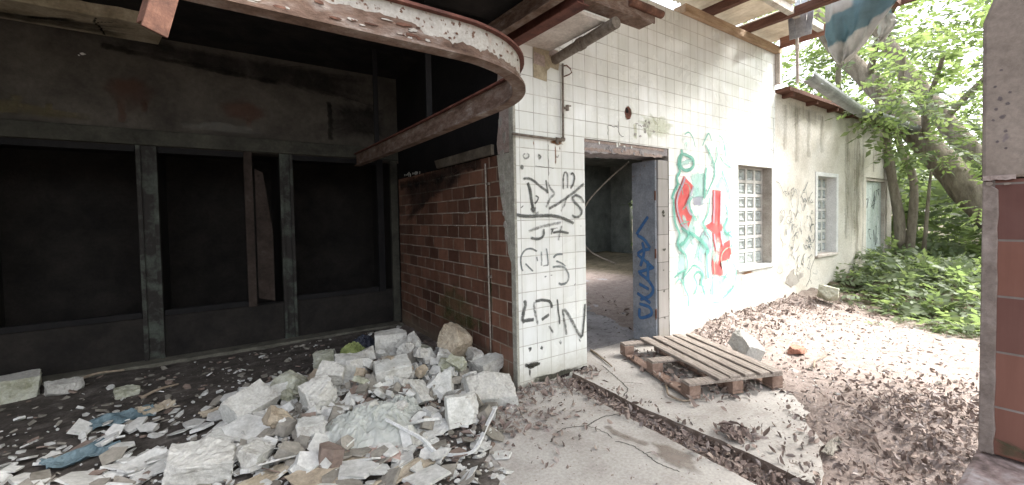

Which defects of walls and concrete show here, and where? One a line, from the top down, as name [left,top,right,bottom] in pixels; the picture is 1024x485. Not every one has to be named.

peeling [247,0,559,82]